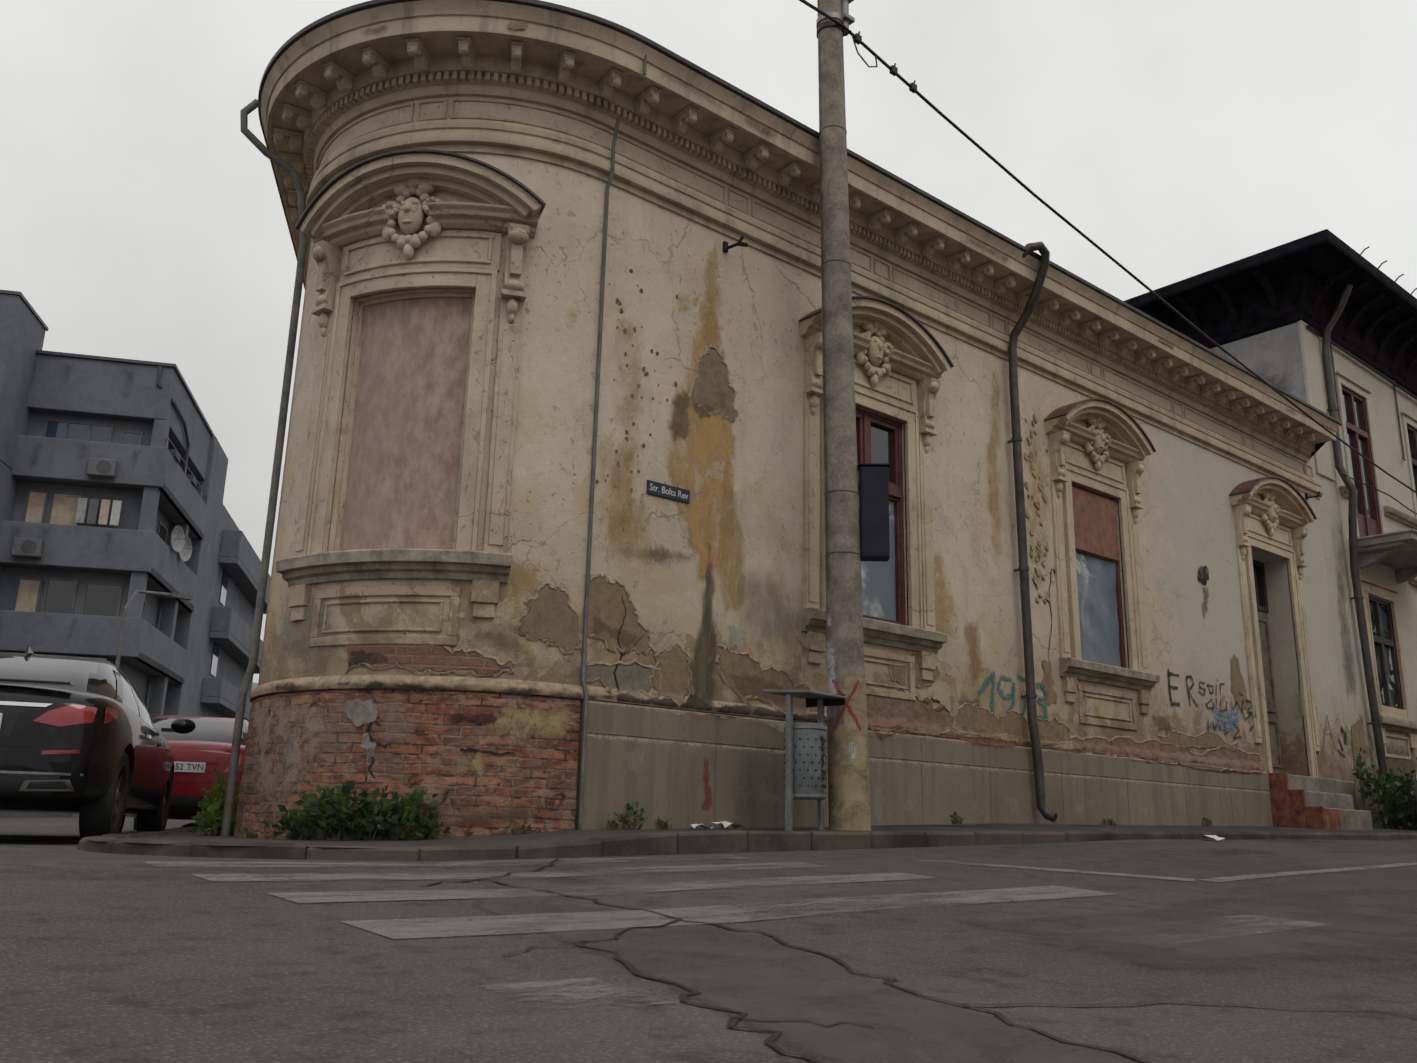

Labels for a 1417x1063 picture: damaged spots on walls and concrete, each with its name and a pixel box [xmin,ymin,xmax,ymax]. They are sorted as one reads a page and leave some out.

spalling [609,283,739,422]
spalling [596,420,655,493]
leakage [669,255,754,701]
leakage [988,386,999,527]
peeling [360,733,376,756]
spalling [515,573,692,707]
spalling [716,644,811,716]
spalling [866,652,1266,774]